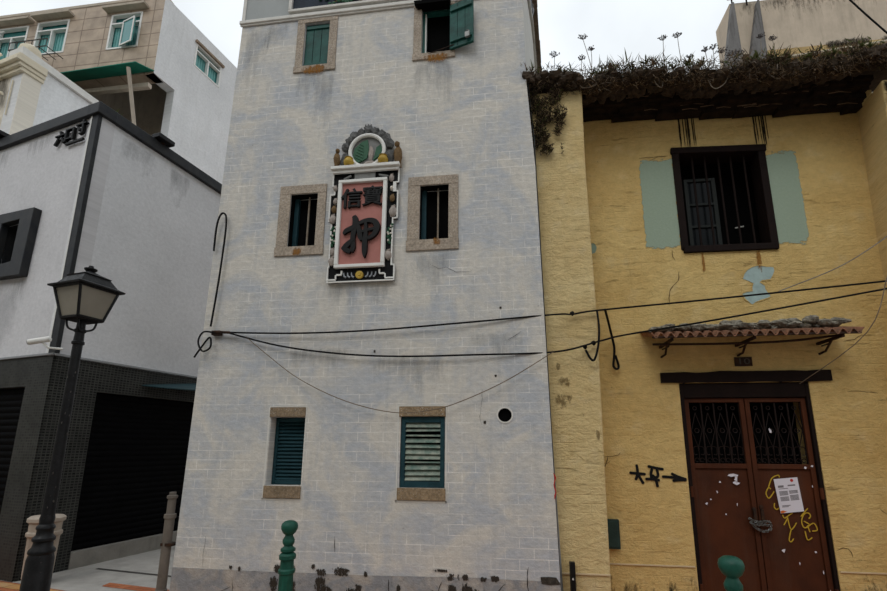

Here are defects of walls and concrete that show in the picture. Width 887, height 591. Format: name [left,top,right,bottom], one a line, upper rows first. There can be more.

water stain [269,564,280,591]
water stain [311,564,350,591]
water stain [433,569,499,591]